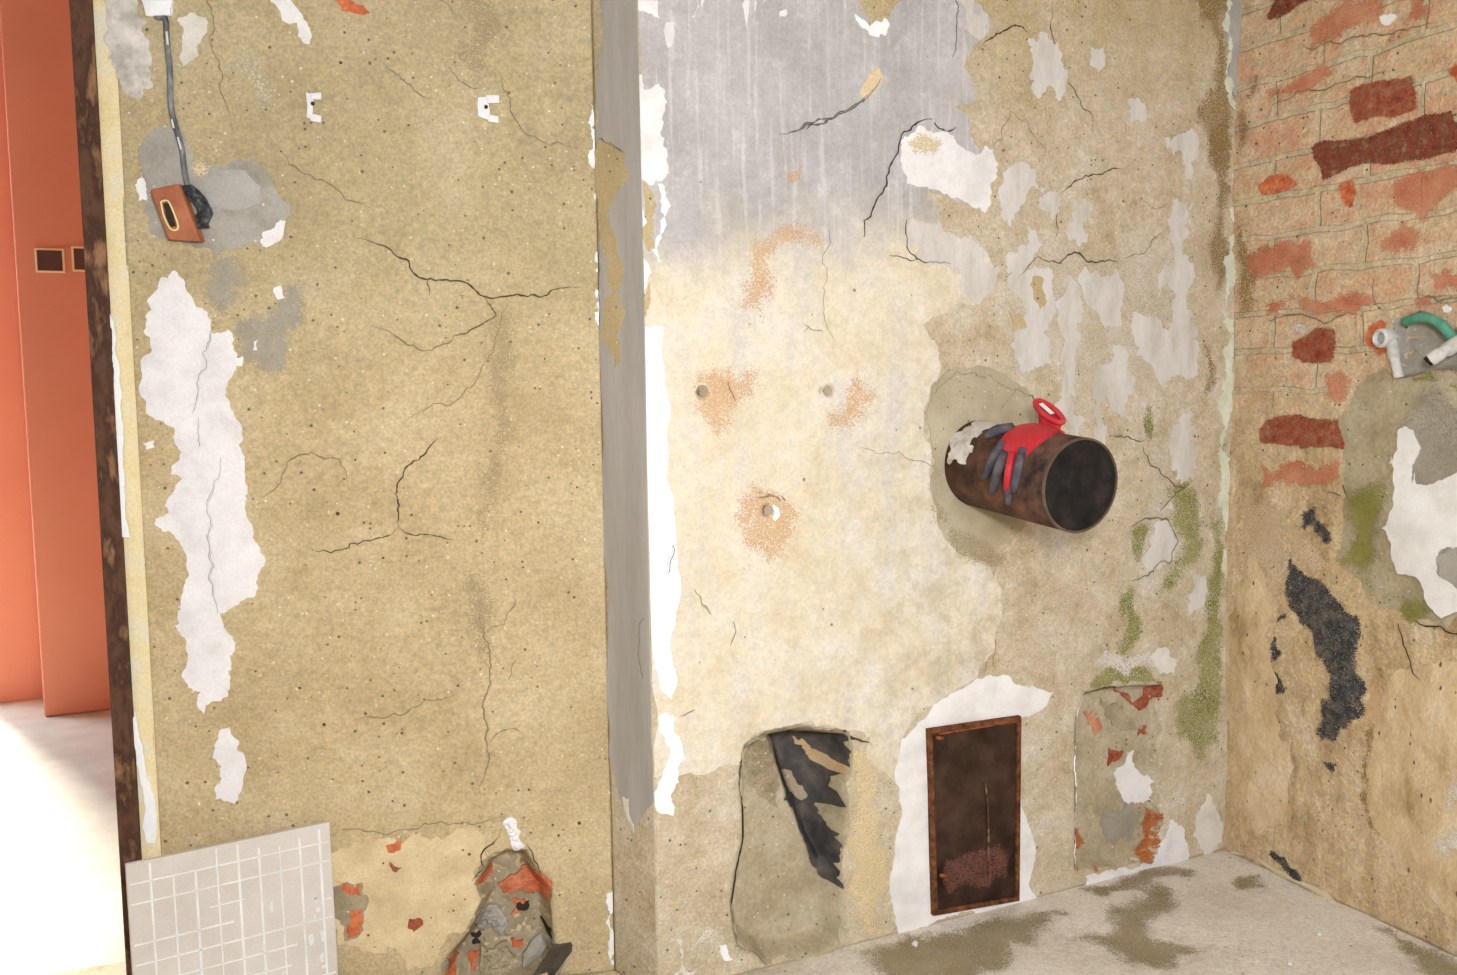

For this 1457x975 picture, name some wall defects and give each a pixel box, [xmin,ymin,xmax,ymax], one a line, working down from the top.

crack [787,78,881,134]
crack [806,119,956,339]
peeling [900,125,998,213]
crack [1022,168,1167,274]
flaking render [1311,75,1457,208]
crack [283,153,579,554]
peeling [139,270,266,714]
leakage [1090,647,1163,689]
flaking render [331,825,556,975]
leakage [848,908,1075,975]
leakage [1071,866,1206,972]
leakage [1361,920,1457,975]